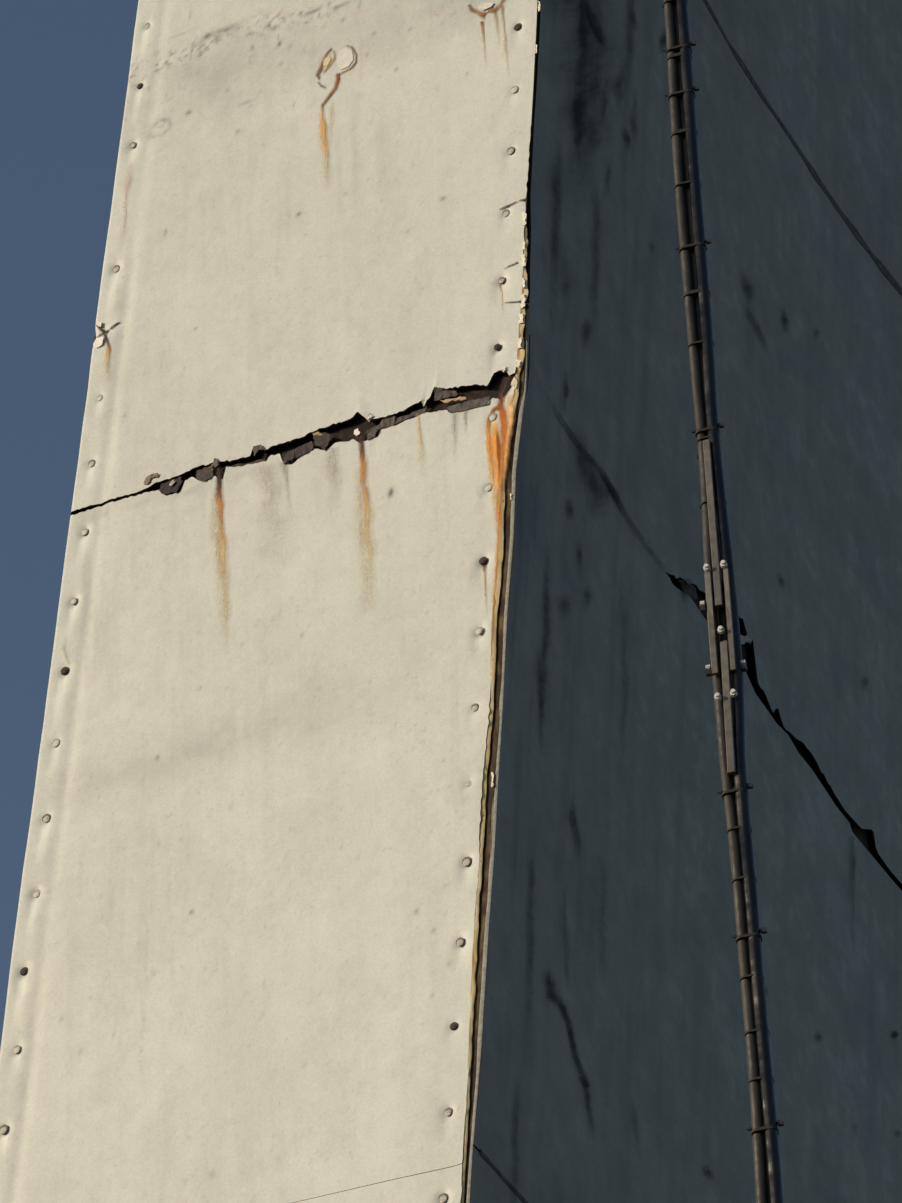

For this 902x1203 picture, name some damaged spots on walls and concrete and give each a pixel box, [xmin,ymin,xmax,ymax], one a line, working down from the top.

rust [468,0,506,51]
rust [316,46,357,171]
rust [214,464,227,619]
crack [77,366,518,514]
rust [358,434,371,569]
rust [461,199,530,1203]
crack [668,575,902,891]